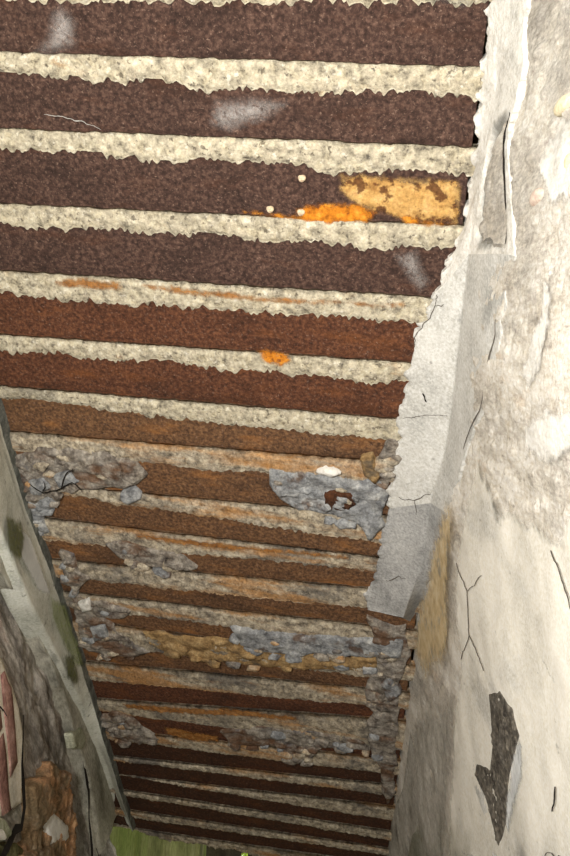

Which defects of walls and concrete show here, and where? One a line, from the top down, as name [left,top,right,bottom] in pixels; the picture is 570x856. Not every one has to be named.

corrosion [275,177,459,224]
corrosion [56,279,118,290]
corrosion [145,285,302,304]
corrosion [261,351,289,366]
spalling [15,447,148,536]
spalling [269,438,402,540]
corrosion [324,490,356,511]
crack [456,563,484,671]
crack [550,550,570,609]
spalling [58,549,411,804]
spalling [0,658,78,856]
flaking render [473,691,522,846]